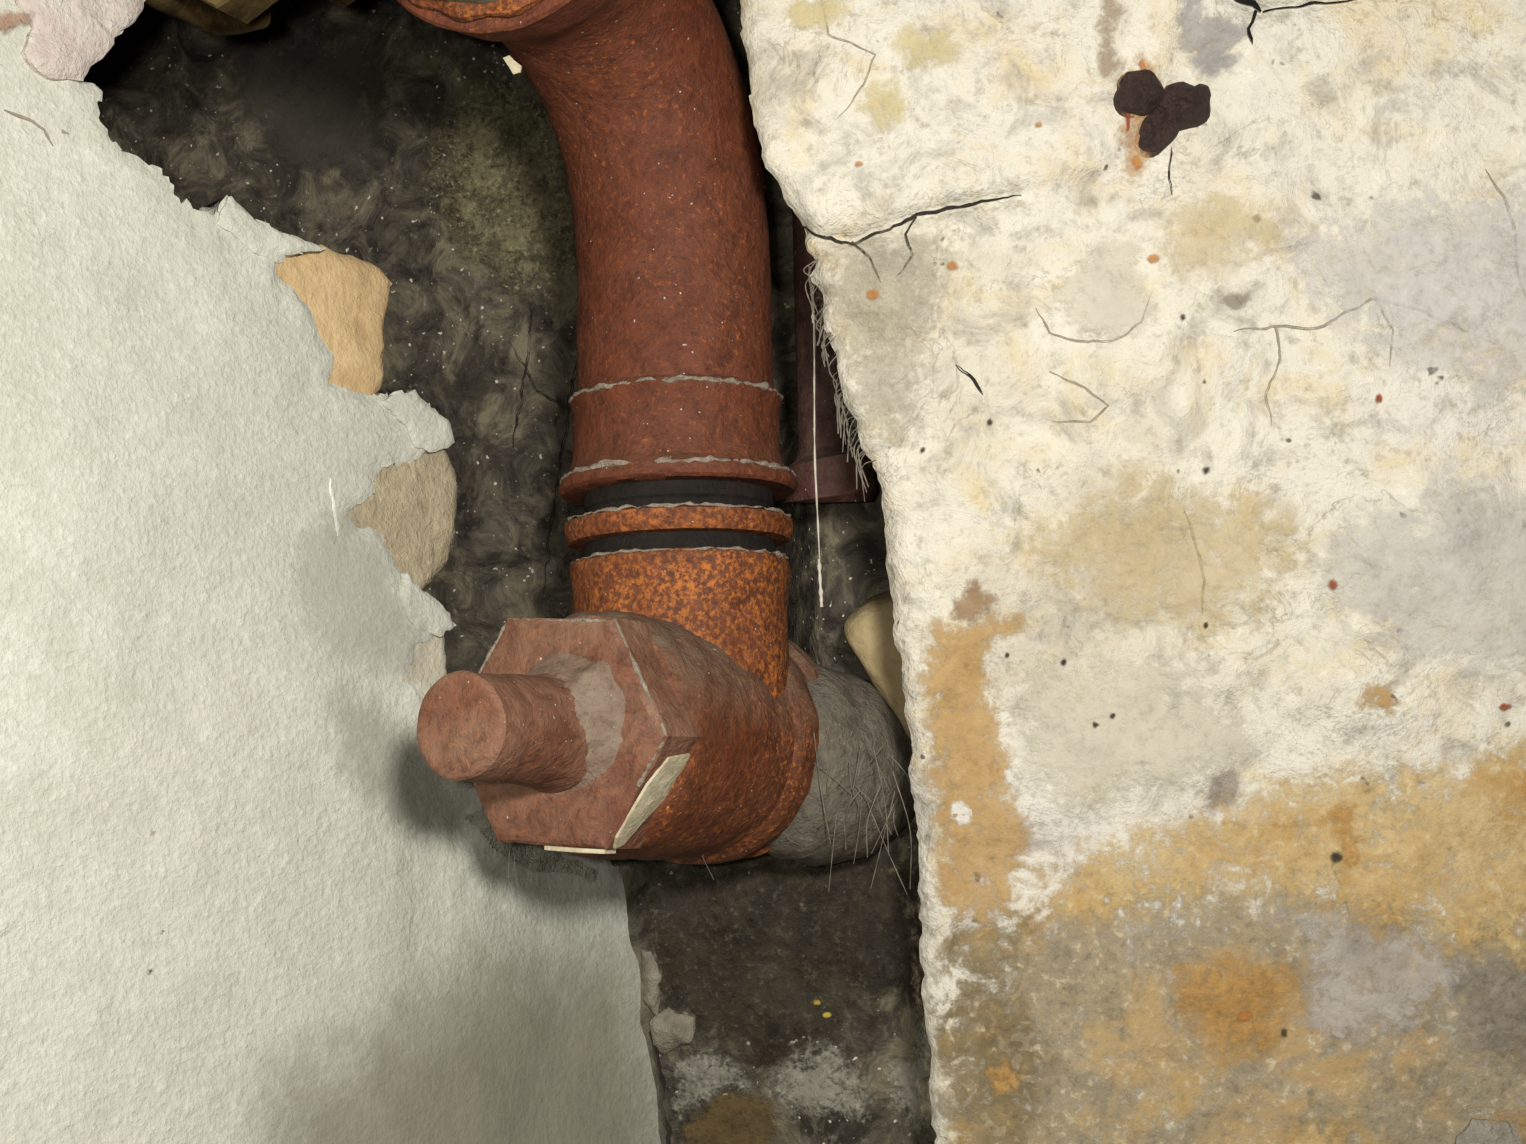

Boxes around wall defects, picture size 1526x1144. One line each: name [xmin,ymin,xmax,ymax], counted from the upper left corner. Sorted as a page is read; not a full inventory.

peeling [0,0,145,82]
corrosion [1133,58,1159,80]
crack [1235,0,1351,44]
corrosion [1122,113,1148,175]
crack [802,195,1018,282]
flaking render [215,196,458,698]
water stain [886,580,1526,1144]